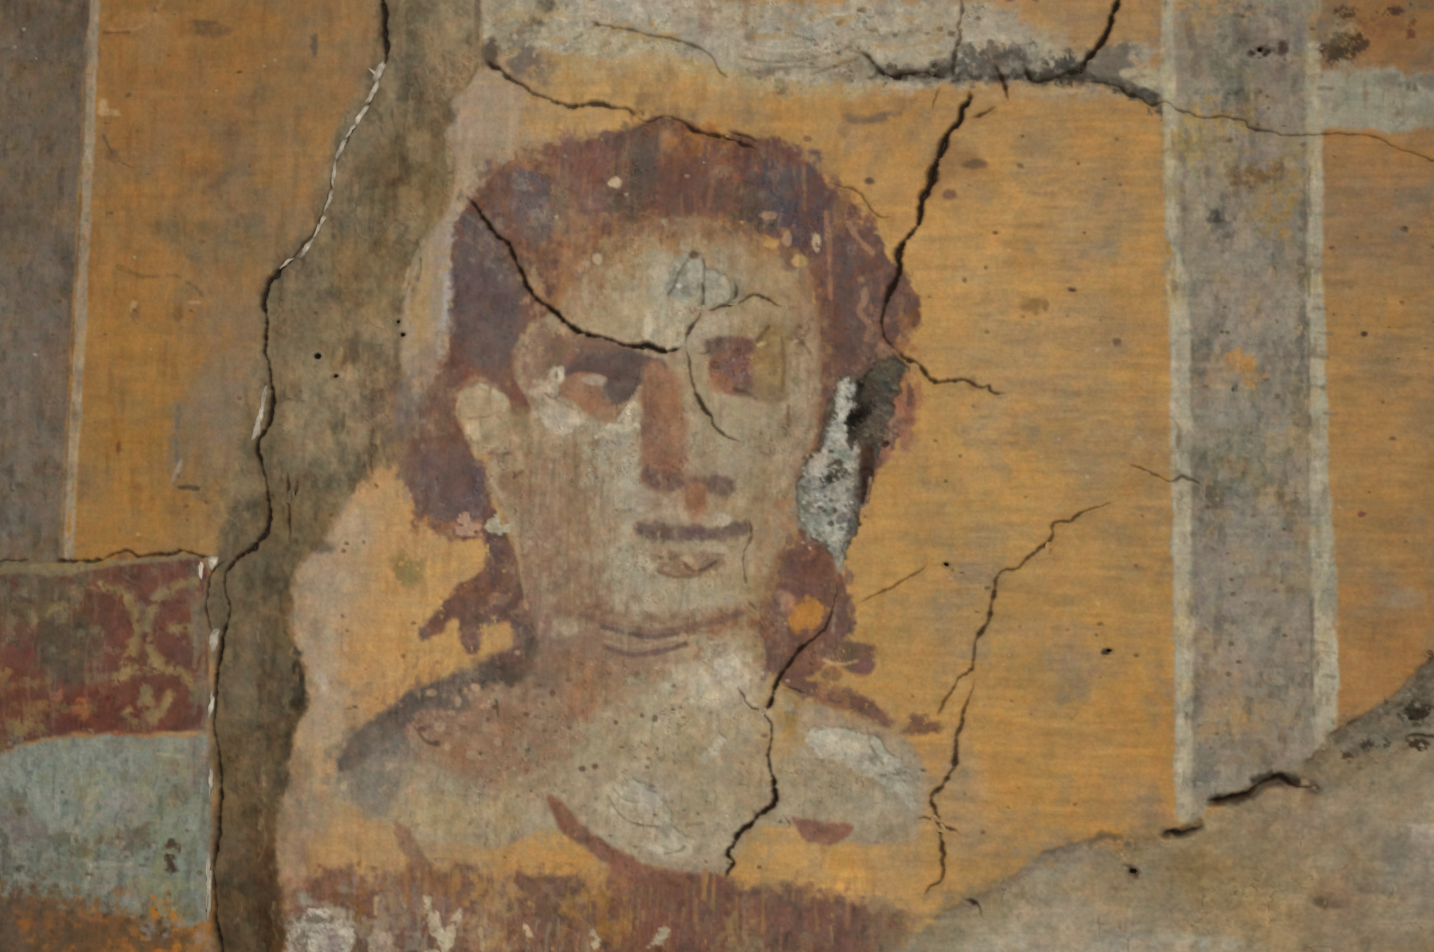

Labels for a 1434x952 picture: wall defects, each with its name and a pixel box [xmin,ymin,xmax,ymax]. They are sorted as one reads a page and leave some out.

crack [481,56,762,153]
crack [463,193,785,447]
crack [587,17,733,83]
crack [829,0,1434,399]
crack [0,0,394,952]
flaking render [796,357,911,568]
crack [720,559,932,883]
peeling [805,726,918,809]
crack [914,460,1208,921]
flaking render [1330,668,1434,757]